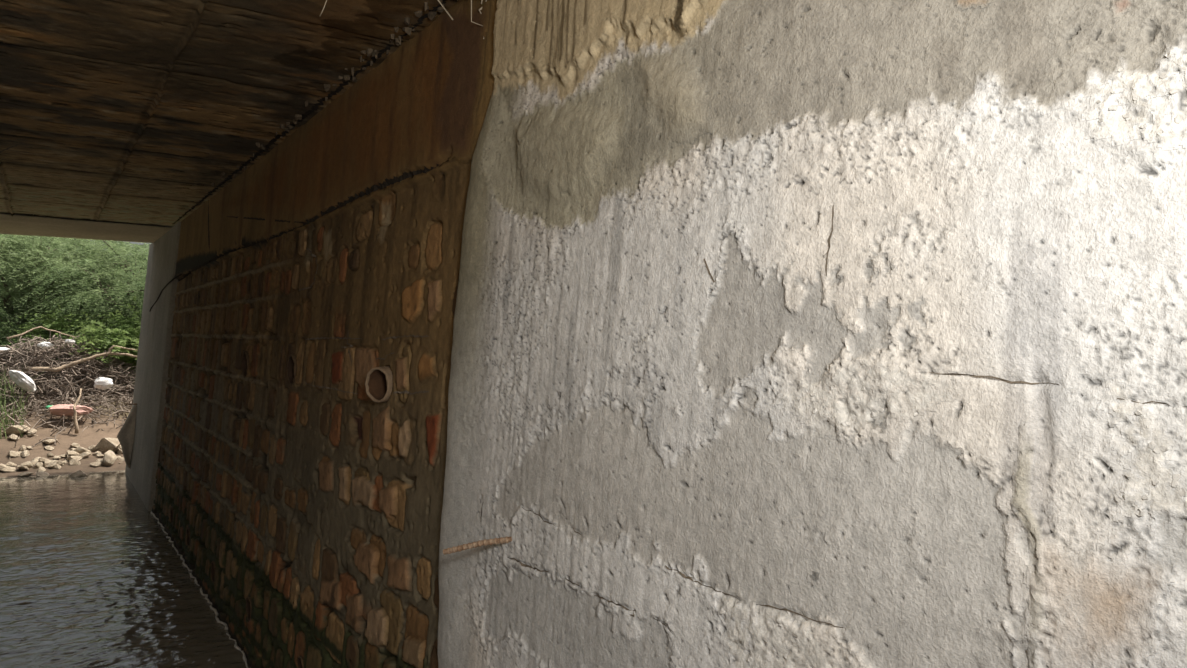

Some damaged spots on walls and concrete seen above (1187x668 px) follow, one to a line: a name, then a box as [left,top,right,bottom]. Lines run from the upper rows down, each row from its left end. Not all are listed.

water stain [0,0,1187,232]
spalling [1097,378,1187,592]
crack [508,557,673,634]
crack [665,565,843,628]